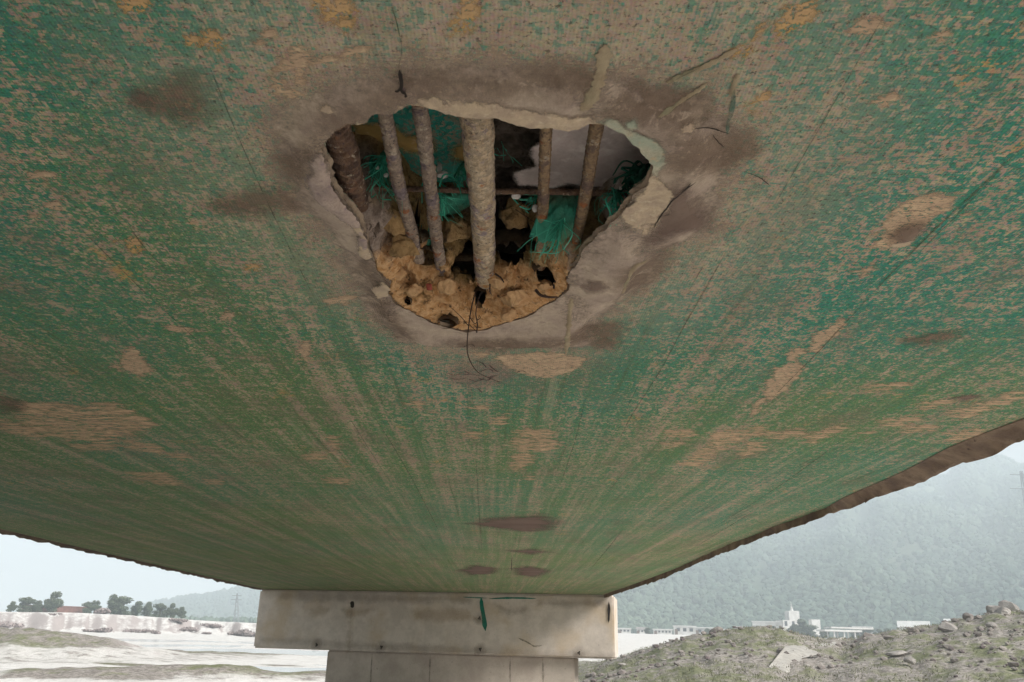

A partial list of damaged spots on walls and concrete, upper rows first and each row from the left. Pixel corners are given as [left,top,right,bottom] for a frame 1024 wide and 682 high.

spalling [304,88,673,333]
crack [654,182,696,227]
damp [645,186,707,244]
damp [474,517,557,532]